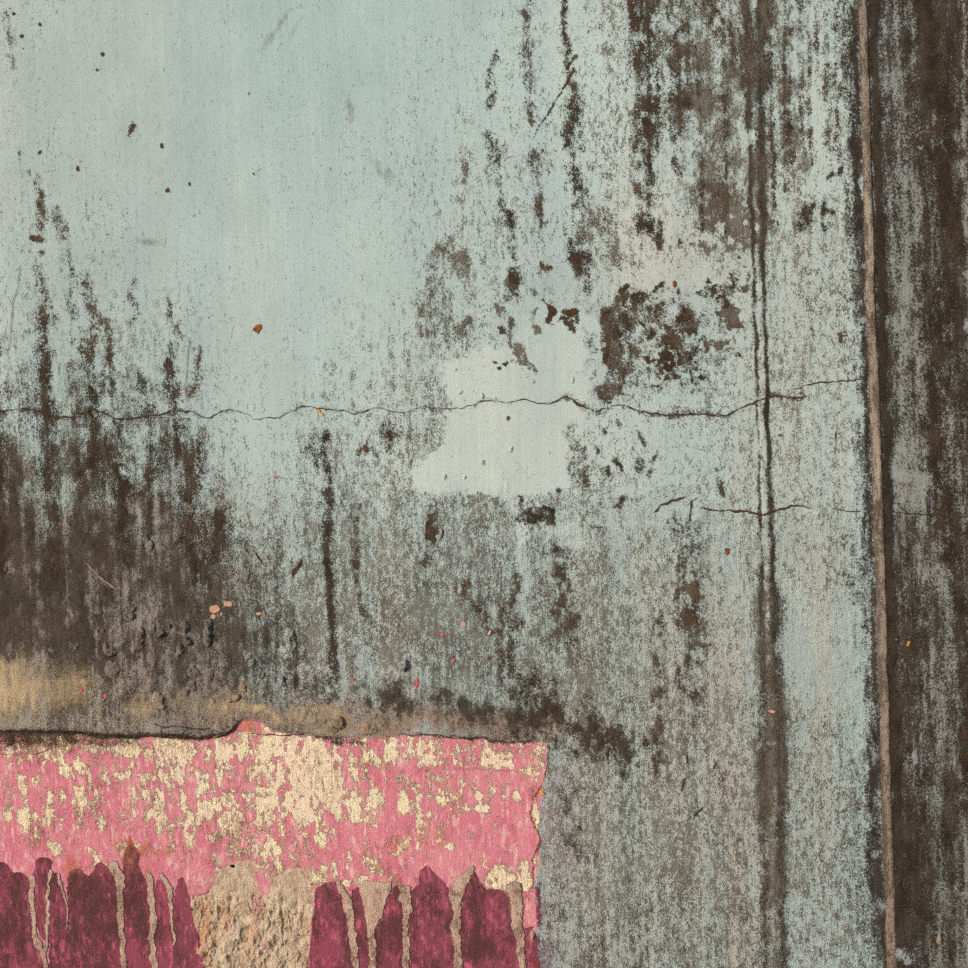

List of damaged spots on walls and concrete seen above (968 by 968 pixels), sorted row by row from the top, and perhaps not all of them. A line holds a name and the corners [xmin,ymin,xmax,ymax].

water stain [1,8,26,71]
crack [0,340,862,421]
water stain [0,169,362,738]
water stain [348,503,369,623]
water stain [356,416,411,466]
water stain [419,511,439,591]
water stain [481,0,968,968]
crack [653,496,809,519]
crack [891,510,968,518]
water stain [460,573,523,671]
peeling [0,719,548,968]